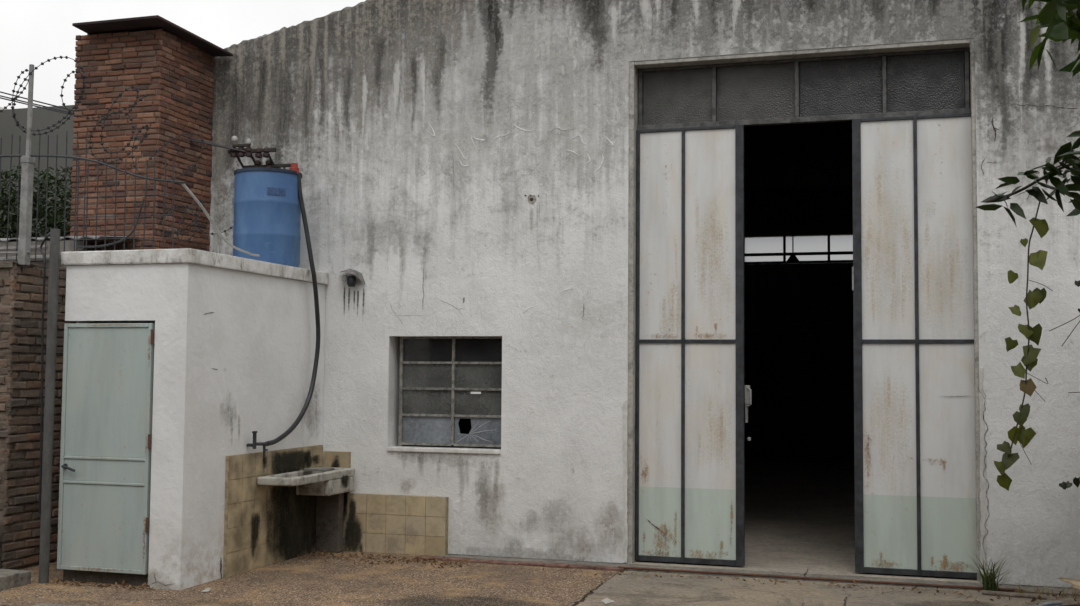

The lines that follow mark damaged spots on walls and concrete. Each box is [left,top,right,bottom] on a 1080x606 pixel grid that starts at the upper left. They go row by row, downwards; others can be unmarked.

water stain [212,0,1080,234]
water stain [251,450,318,561]
water stain [343,492,362,552]